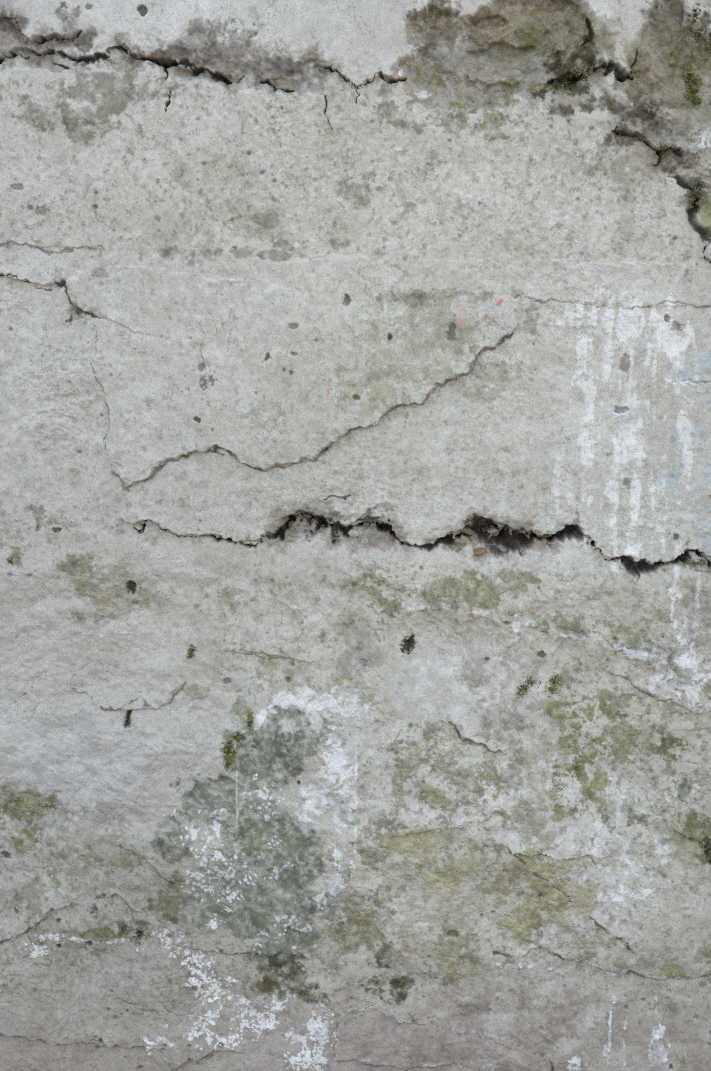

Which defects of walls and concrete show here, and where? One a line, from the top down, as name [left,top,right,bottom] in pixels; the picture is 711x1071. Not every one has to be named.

crack [0,14,295,112]
crack [323,66,408,130]
spalling [389,0,711,224]
crack [611,126,711,263]
crack [0,240,711,493]
crack [134,494,711,582]
leakage [163,684,373,930]
leakage [19,933,145,958]
leakage [251,910,317,959]
leakage [142,927,711,1071]
crack [493,846,707,982]